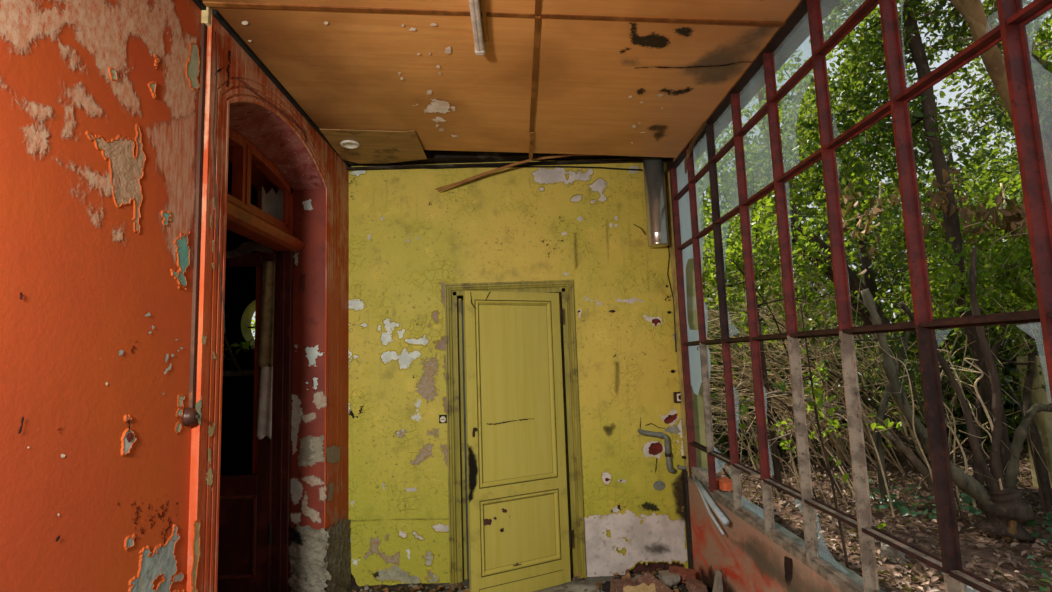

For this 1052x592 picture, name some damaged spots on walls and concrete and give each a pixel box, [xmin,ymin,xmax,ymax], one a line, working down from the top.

damp [619,23,693,53]
damp [660,26,771,96]
peeling [0,0,201,291]
peeling [531,165,608,205]
peeling [291,344,327,456]
peeling [349,281,447,447]
peeling [410,429,448,466]
peeling [118,500,201,592]
spalling [288,474,449,592]
peeling [583,504,688,577]